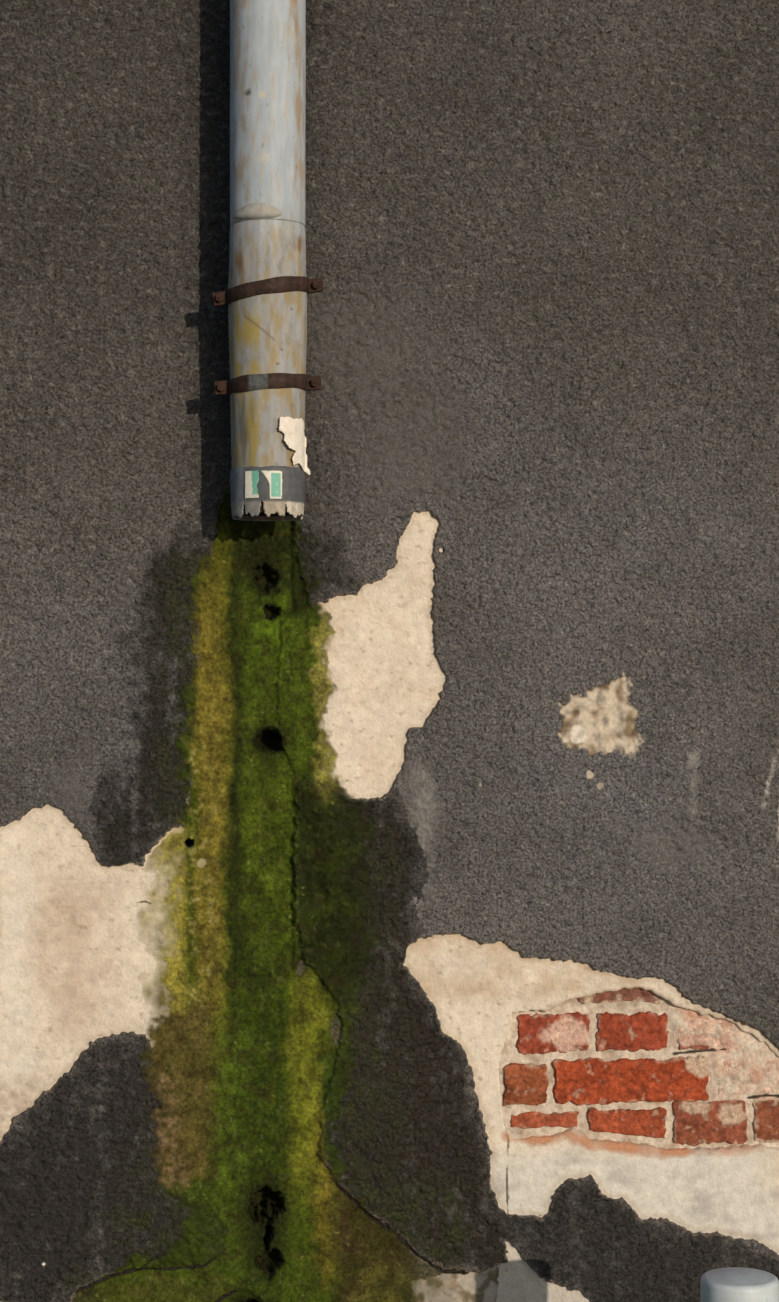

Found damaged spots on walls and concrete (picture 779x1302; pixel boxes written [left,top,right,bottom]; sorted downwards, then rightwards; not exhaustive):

leakage [95,544,210,866]
peeling [319,511,446,799]
spalling [557,672,644,790]
leakage [0,1039,193,1302]
peeling [0,804,207,1142]
peeling [414,1241,591,1302]
peeling [403,934,779,1255]